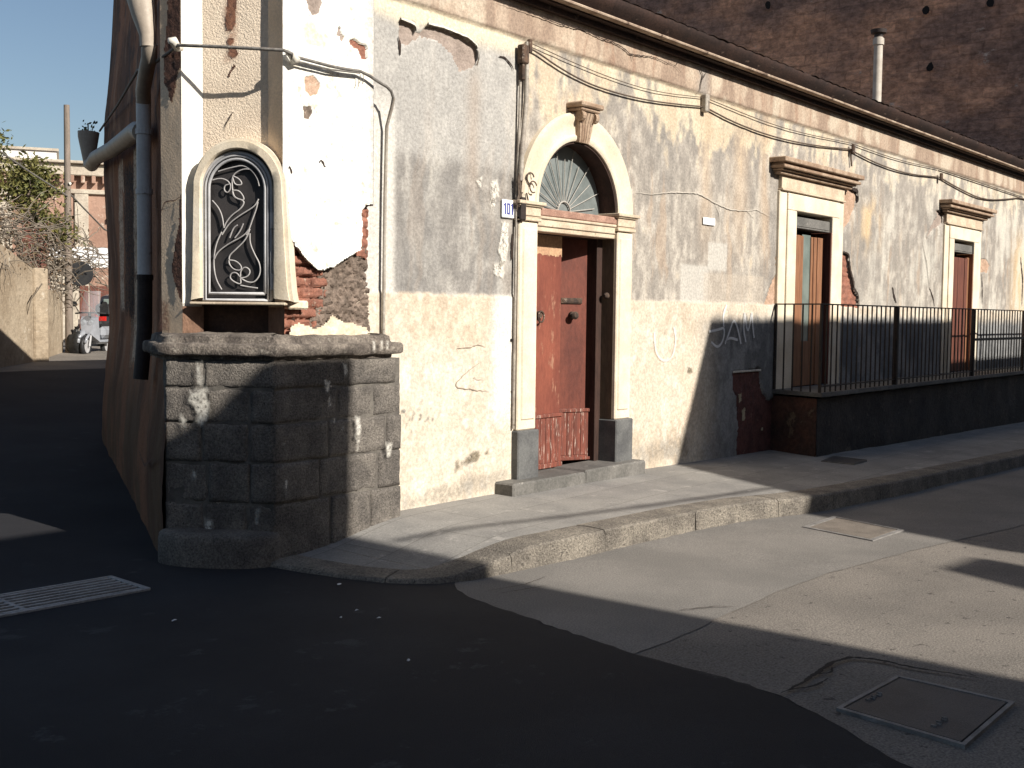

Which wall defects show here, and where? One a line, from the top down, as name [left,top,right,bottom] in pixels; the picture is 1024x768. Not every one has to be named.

flaking render [336,28,366,60]
peeling [399,17,479,72]
flaking render [303,75,320,119]
flaking render [843,190,856,227]
flaking render [284,203,372,336]
flaking render [841,254,857,308]
efflorescence [181,367,208,427]